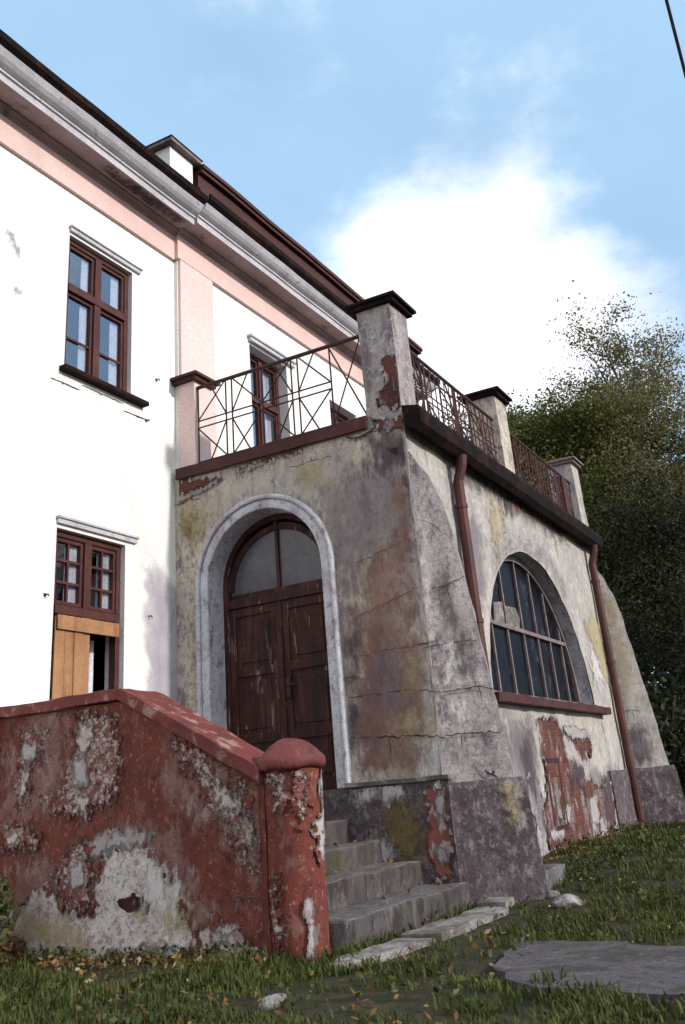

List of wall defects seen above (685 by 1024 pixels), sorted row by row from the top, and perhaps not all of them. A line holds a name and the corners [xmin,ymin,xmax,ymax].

spalling [371,351,403,432]
spalling [178,475,222,502]
crack [357,518,444,563]
crack [398,576,464,614]
crack [344,639,496,698]
crack [352,730,500,754]
spalling [526,715,620,852]
spalling [0,708,258,963]
peeling [171,736,325,960]
leakage [359,786,428,863]
peeling [423,780,454,883]